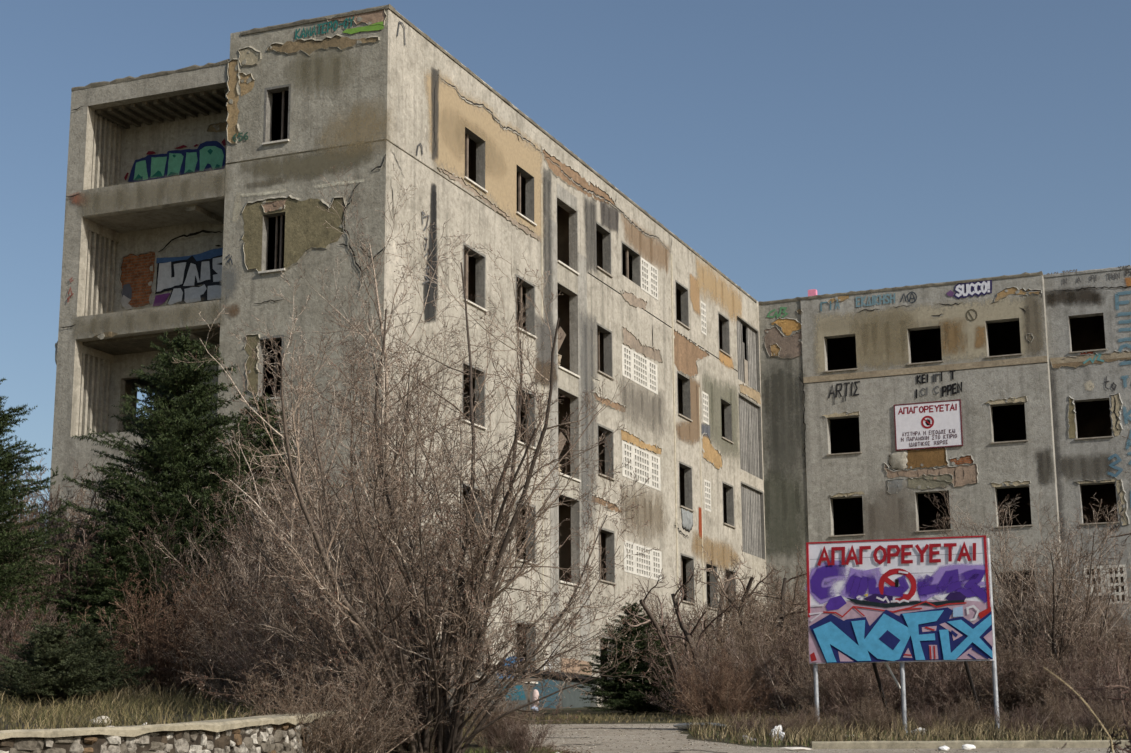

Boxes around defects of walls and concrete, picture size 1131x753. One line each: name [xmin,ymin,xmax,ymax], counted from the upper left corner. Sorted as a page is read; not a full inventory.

spalling [206,9,387,145]
spalling [241,195,347,276]
crack [339,152,403,293]
peeling [437,167,541,243]
spalling [119,250,155,310]
spalling [621,326,710,379]
peeling [764,309,803,359]
spalling [1067,396,1076,439]
spalling [1109,393,1123,436]
spalling [702,433,723,470]
water stain [762,359,806,554]
spalling [883,447,1031,489]